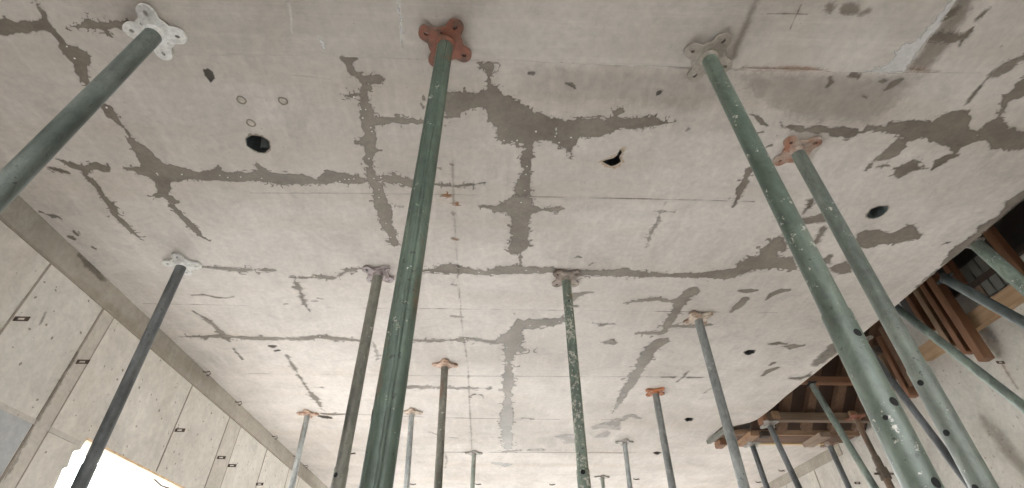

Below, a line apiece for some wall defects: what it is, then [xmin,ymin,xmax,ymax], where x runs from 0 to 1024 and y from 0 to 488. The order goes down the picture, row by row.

water stain [0,4,132,86]
peeling [866,0,956,74]
water stain [101,56,425,247]
water stain [781,55,1024,178]
water stain [48,159,145,240]
water stain [423,61,797,437]
water stain [856,224,922,248]
water stain [186,311,360,360]
water stain [285,355,323,407]
water stain [407,313,565,467]